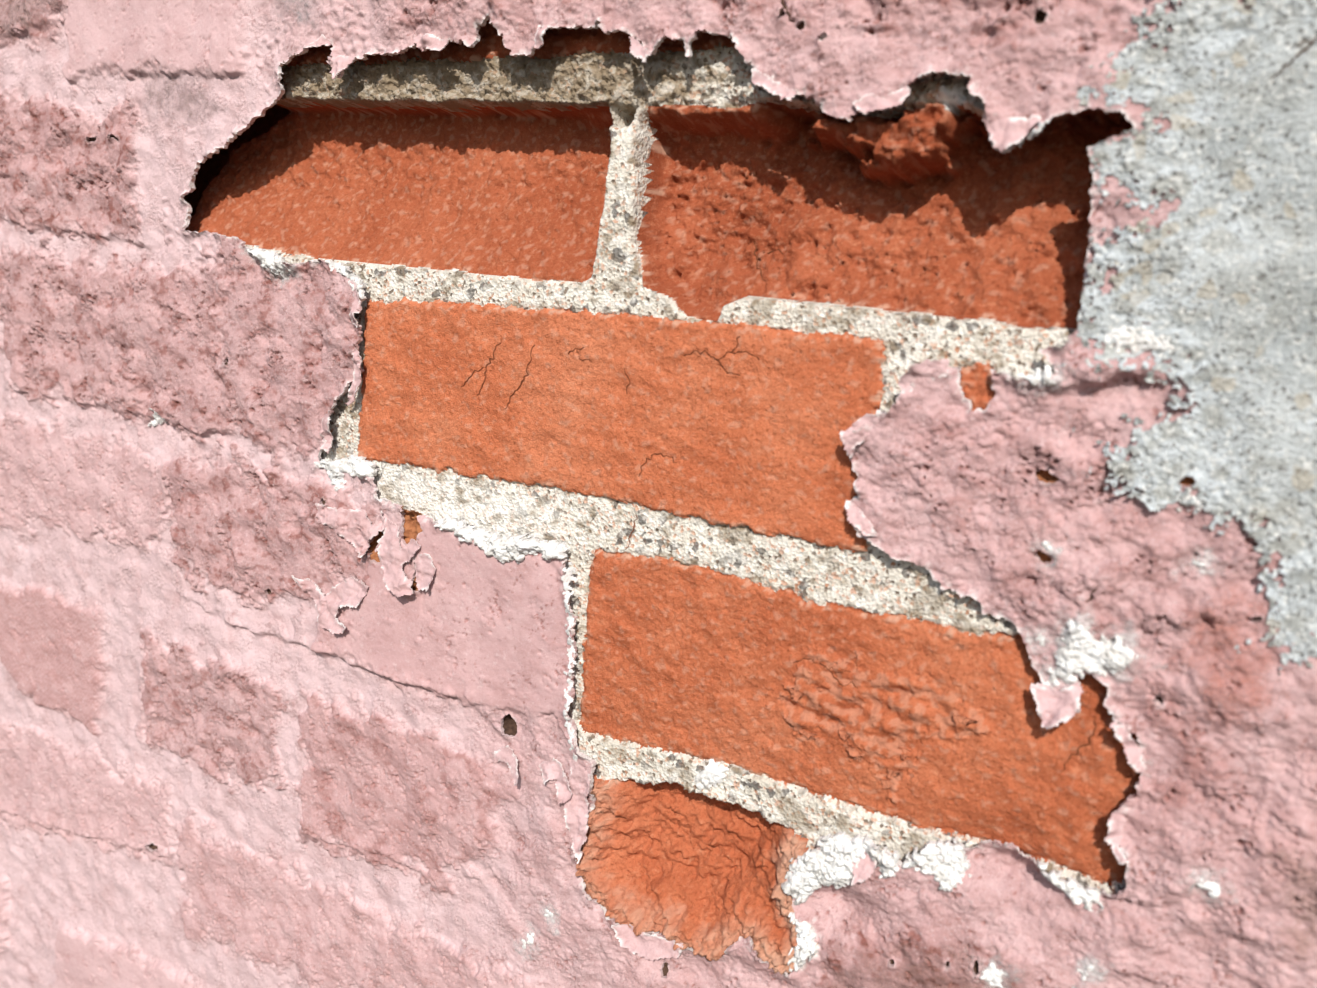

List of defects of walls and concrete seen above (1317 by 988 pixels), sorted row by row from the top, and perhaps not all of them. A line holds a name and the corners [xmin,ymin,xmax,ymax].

crack [463,338,535,409]
peeling [187,18,1145,974]
spalling [1179,476,1196,486]